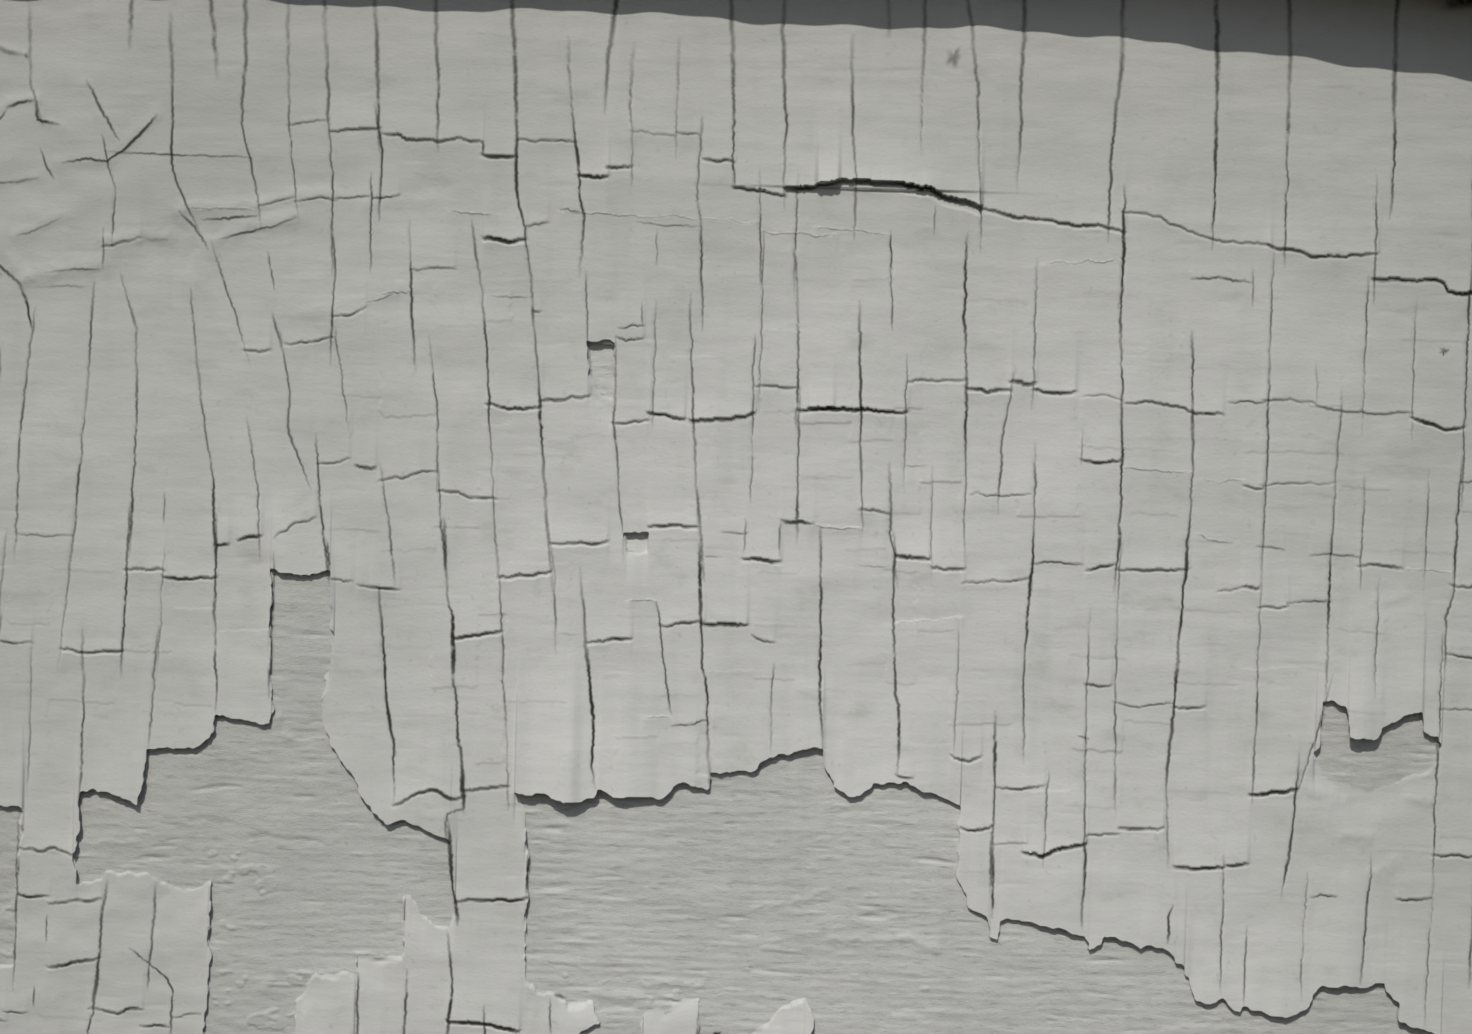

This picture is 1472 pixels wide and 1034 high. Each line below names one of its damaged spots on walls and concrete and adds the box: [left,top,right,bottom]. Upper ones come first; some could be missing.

crack [285,59,526,391]
crack [711,77,955,277]
peeling [0,710,24,965]
peeling [73,479,457,1034]
crack [88,402,494,653]
crack [382,606,528,916]
crack [637,556,768,734]
crack [767,336,923,778]
peeling [514,661,1444,1034]
crack [958,116,1269,907]
peeling [1314,598,1443,793]
crack [1365,278,1472,720]